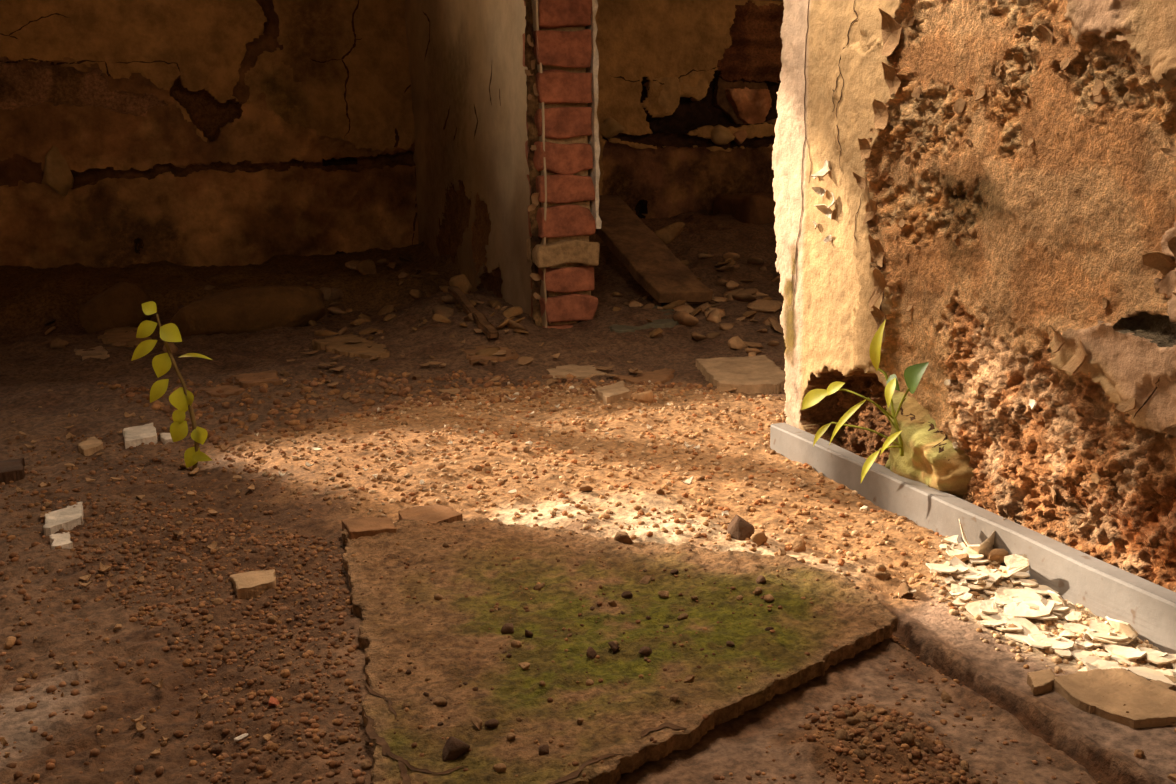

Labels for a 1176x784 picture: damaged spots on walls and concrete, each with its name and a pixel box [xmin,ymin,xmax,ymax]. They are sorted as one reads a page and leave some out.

crack [70,0,418,245]
spalling [586,0,784,229]
spalling [471,193,503,298]
spalling [800,0,1176,592]
crack [889,619,1149,784]